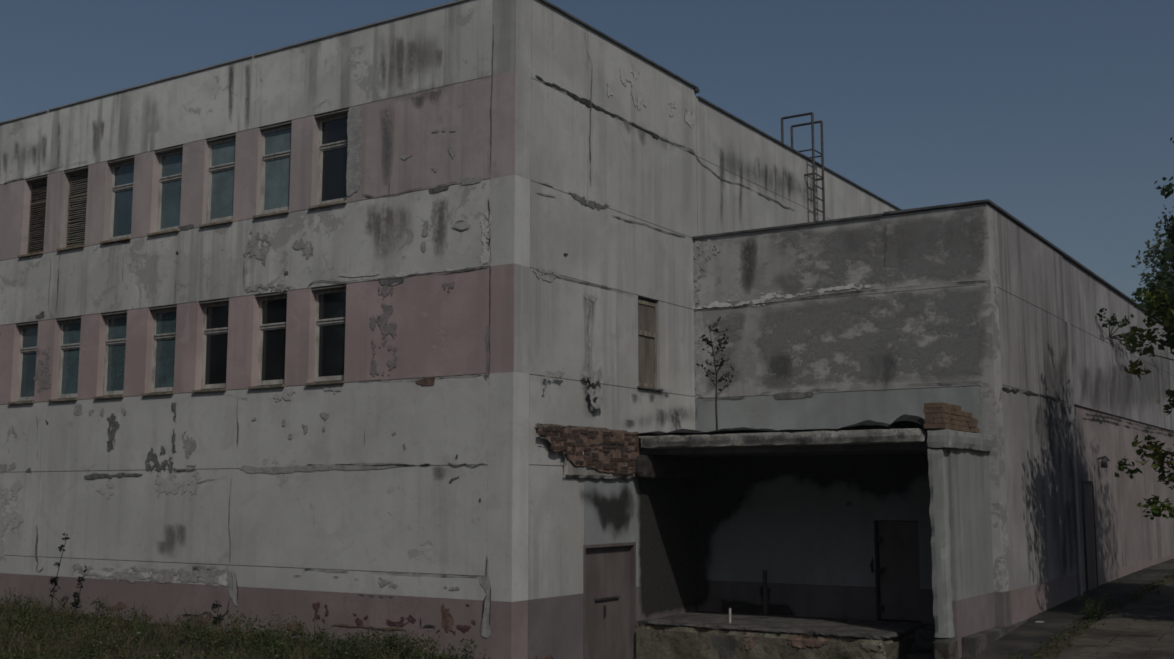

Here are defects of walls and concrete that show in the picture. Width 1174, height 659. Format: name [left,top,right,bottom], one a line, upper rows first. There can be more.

peeling [243,230,272,266]
peeling [339,271,419,376]
peeling [74,403,126,451]
peeling [145,402,196,473]
spalling [538,427,641,475]